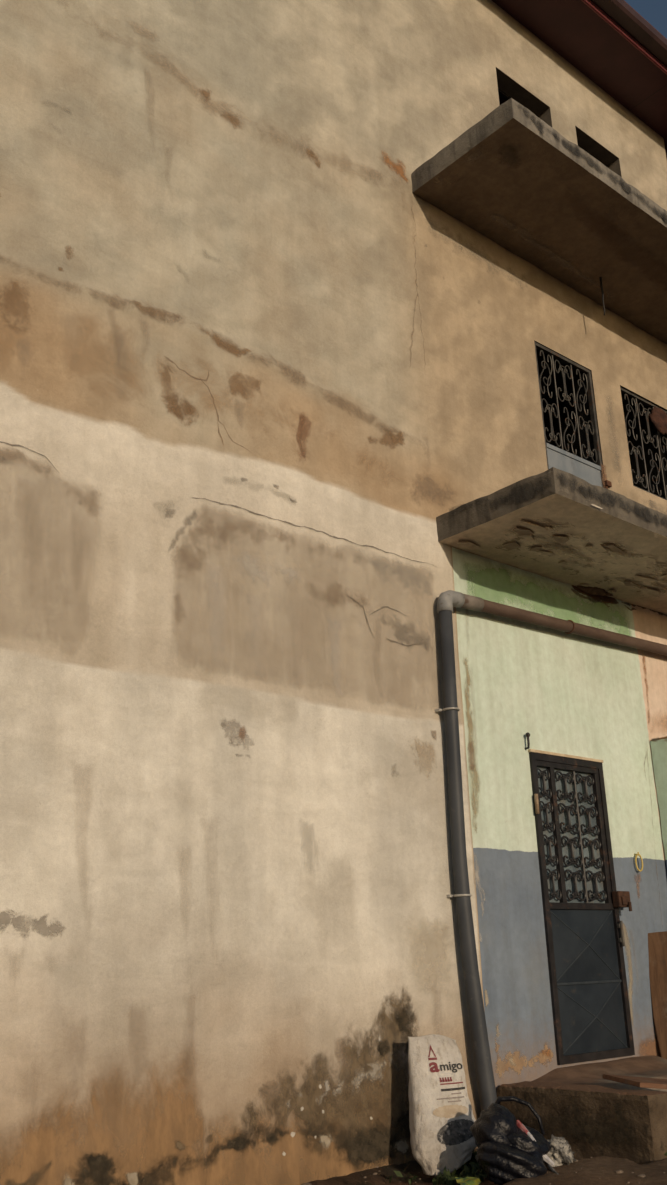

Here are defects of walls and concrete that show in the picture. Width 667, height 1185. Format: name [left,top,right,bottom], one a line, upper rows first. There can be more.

damp [212,335,250,356]
damp [167,399,195,418]
damp [369,432,403,447]
crack [192,497,436,567]
peeling [495,520,667,607]
crack [345,594,416,646]
peeling [495,1026,553,1077]
damp [0,993,416,1185]